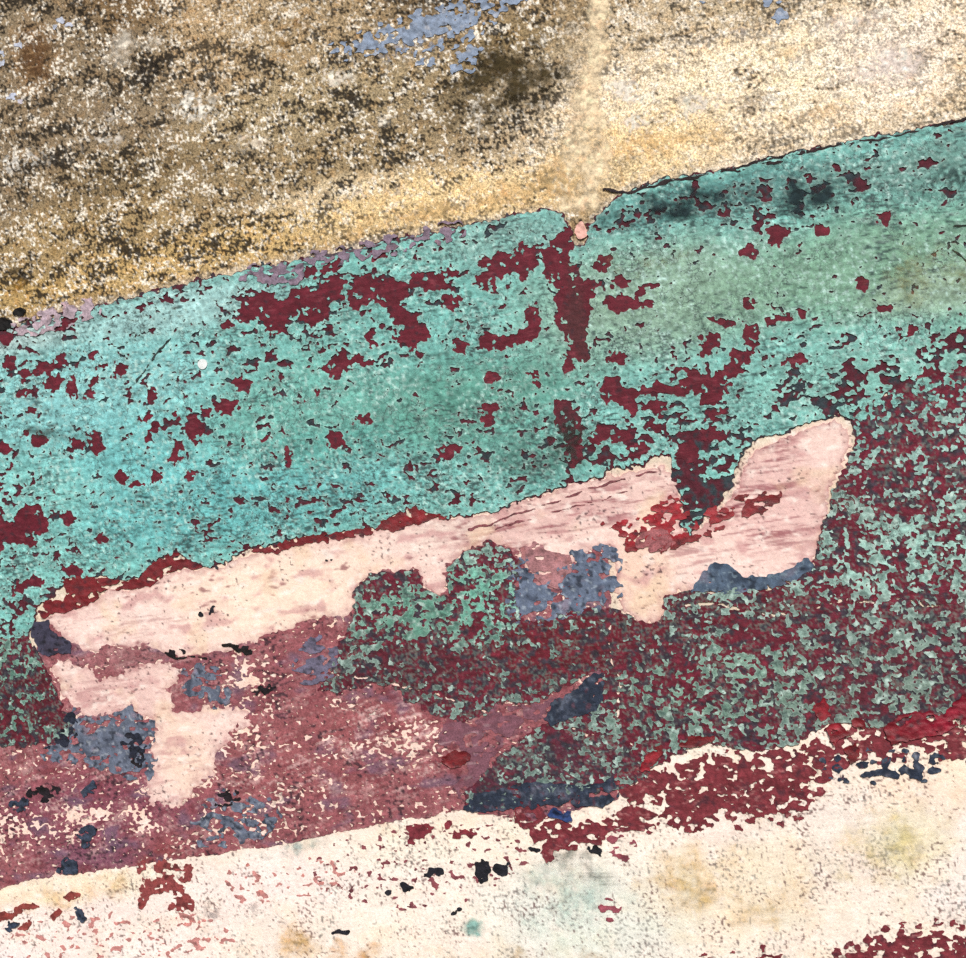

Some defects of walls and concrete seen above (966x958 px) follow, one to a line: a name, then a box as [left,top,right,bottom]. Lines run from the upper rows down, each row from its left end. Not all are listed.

peeling [763,0,789,24]
peeling [328,0,528,75]
peeling [738,224,791,260]
peeling [814,224,830,237]
peeling [876,211,891,227]
peeling [221,220,467,356]
peeling [452,227,660,375]
peeling [855,276,869,293]
flaking render [0,297,966,911]
peeling [11,891,235,958]
peeling [881,917,966,932]